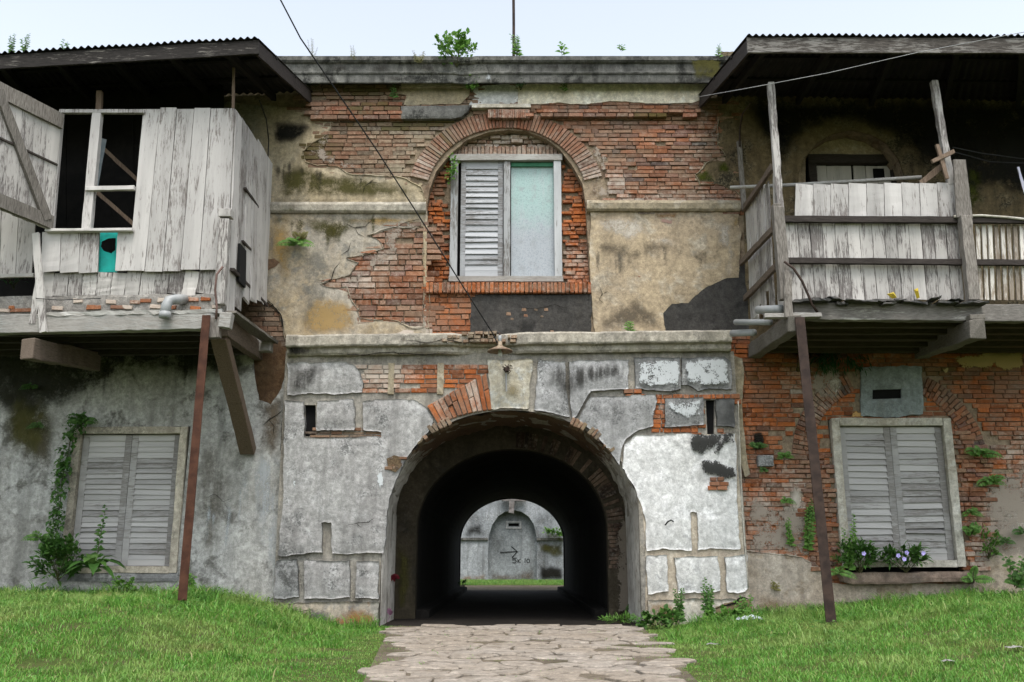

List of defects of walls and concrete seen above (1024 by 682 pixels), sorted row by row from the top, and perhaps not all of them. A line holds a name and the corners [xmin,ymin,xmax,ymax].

spalling [287,84,744,215]
spalling [320,222,517,344]
spalling [244,292,287,404]
spalling [355,363,492,487]
spalling [624,264,1024,584]